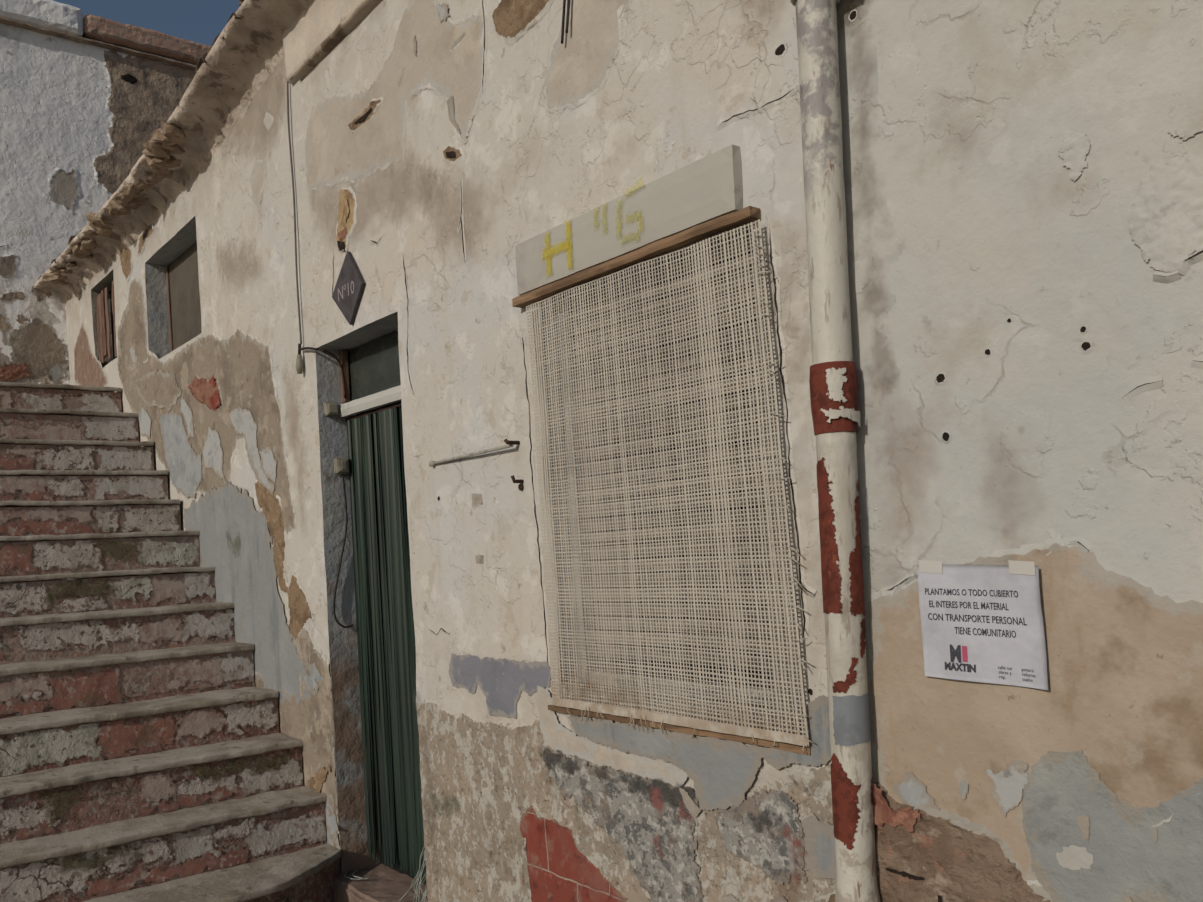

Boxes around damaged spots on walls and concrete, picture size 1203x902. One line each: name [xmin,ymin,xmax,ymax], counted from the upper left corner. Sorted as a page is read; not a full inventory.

peeling [304,0,632,253]
crack [717,81,800,131]
peeling [0,48,340,902]
peeling [821,367,861,428]
peeling [416,534,1203,902]